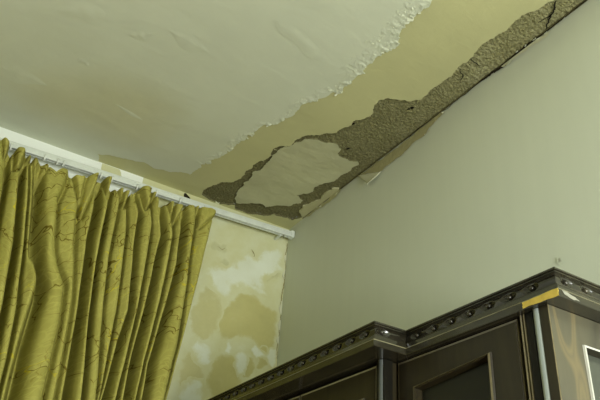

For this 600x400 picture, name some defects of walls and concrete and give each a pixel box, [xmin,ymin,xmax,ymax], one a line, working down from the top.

peeling [98,0,583,229]
crack [303,0,588,218]
leakage [176,283,281,399]